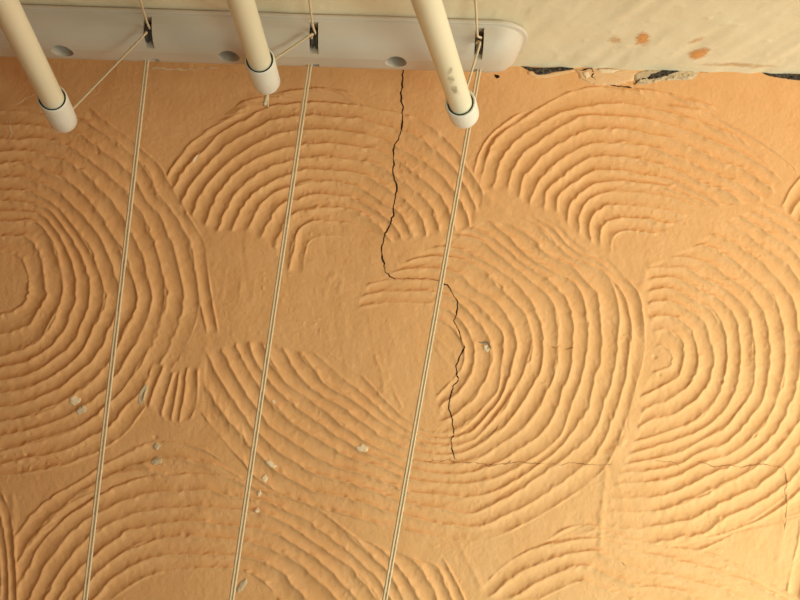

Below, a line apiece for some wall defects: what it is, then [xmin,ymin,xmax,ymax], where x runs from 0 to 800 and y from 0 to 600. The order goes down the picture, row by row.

flaking render [527,68,698,88]
crack [381,70,610,467]
crack [697,461,788,530]